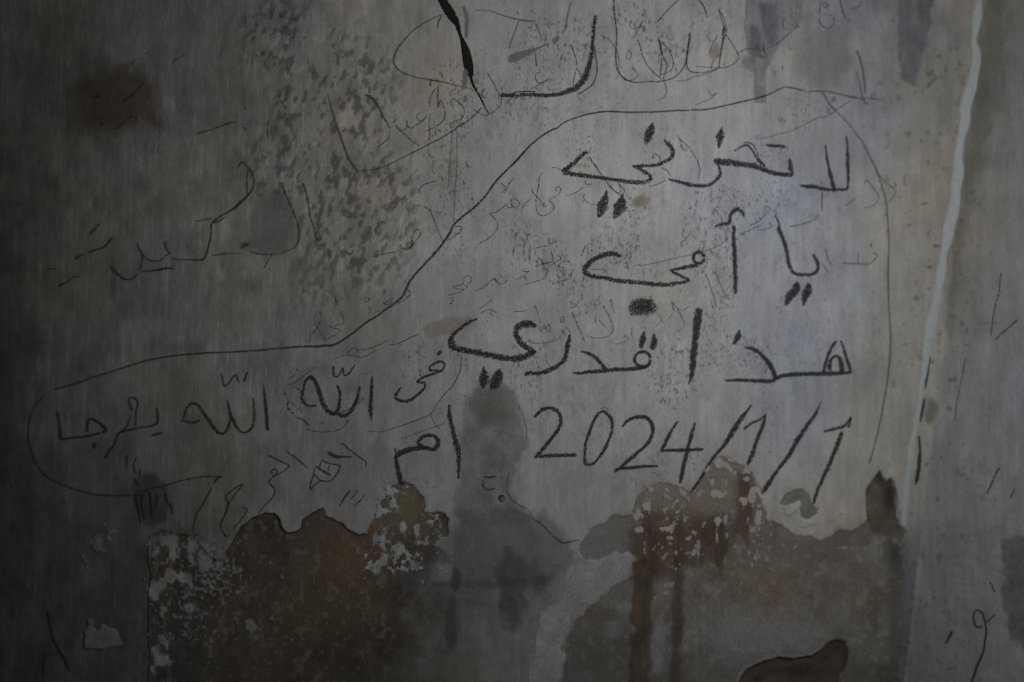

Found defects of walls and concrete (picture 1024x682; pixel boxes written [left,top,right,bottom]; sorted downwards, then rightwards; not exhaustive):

crack [437,0,489,113]
spalling [144,480,452,682]
water stain [443,379,565,643]
spalling [564,451,906,682]